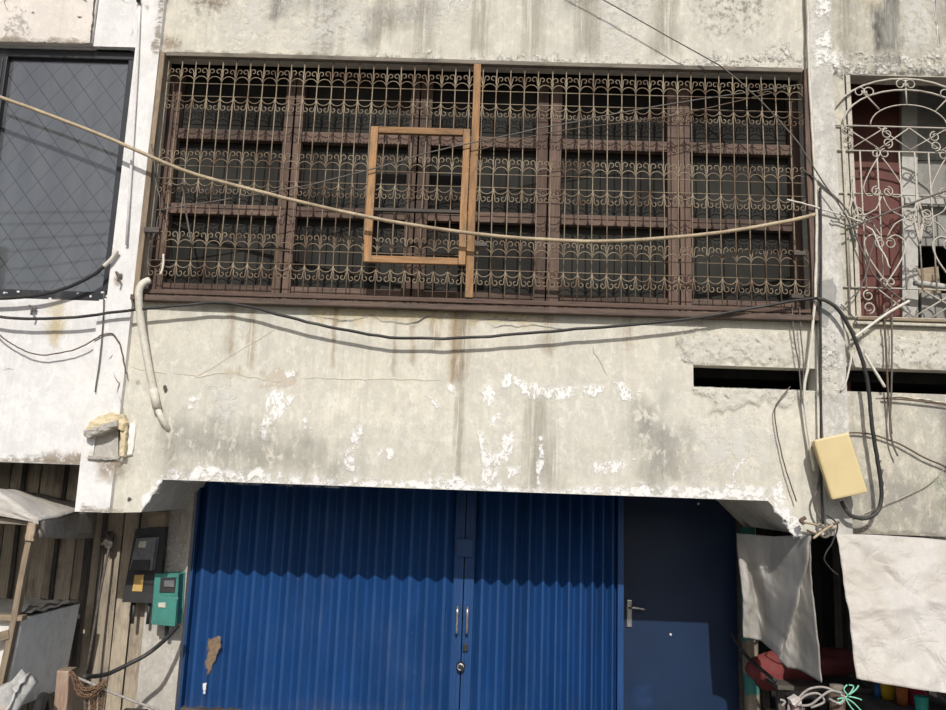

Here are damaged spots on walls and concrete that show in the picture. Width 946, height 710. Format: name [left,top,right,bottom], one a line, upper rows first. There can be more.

peeling [815,0,831,17]
damp [868,0,899,50]
peeling [497,30,946,78]
peeling [480,385,501,426]
peeling [519,382,604,401]
spalling [84,412,136,460]
peeling [82,432,803,536]